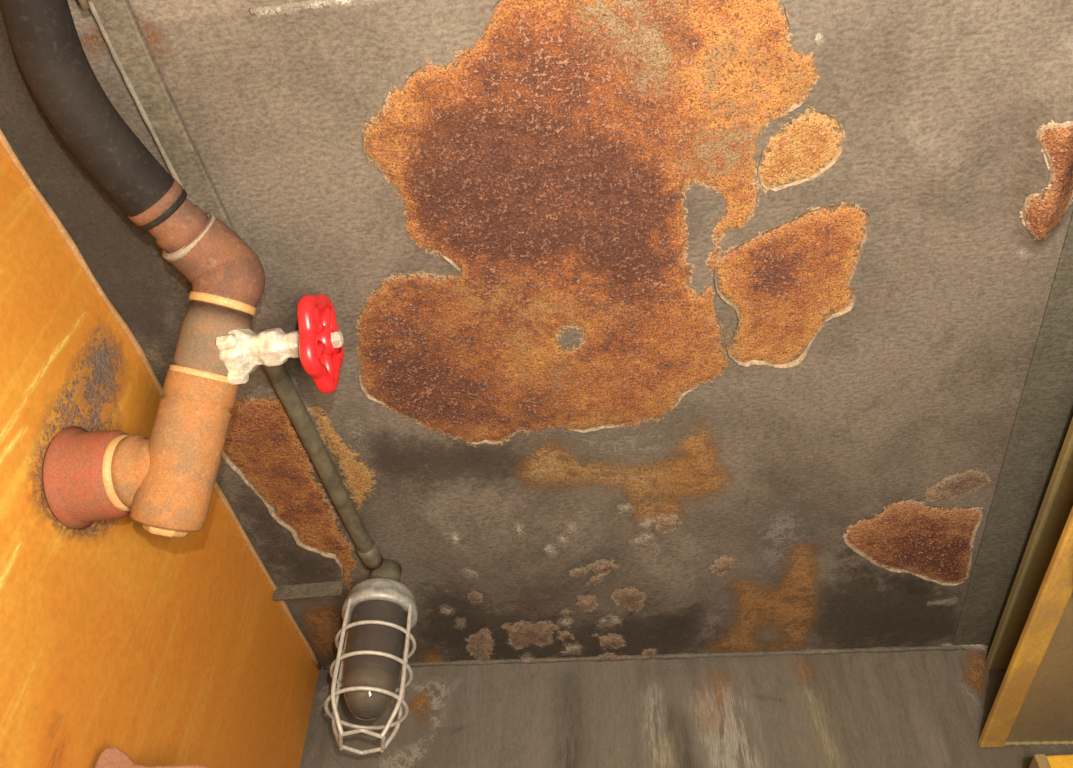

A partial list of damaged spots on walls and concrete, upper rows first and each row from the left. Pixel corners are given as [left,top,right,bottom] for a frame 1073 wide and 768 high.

rust [1018,120,1073,240]
rust [355,0,870,553]
rust [222,395,357,592]
rust [306,403,379,514]
rust [842,469,991,586]
rust [440,559,656,664]